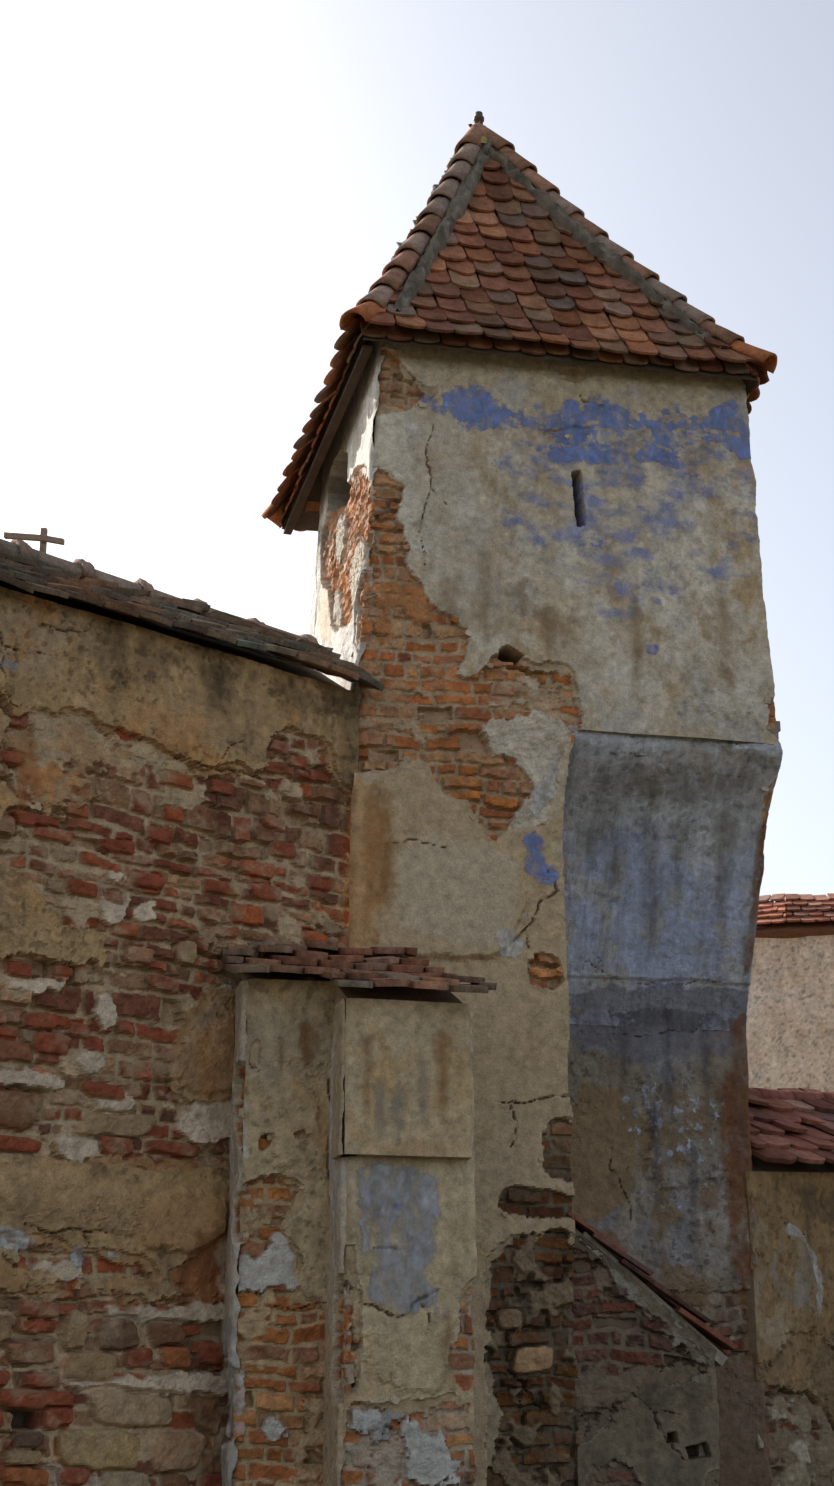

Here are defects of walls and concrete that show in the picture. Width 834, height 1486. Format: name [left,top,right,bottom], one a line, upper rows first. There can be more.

crack [419,421,451,566]
peeling [376,347,751,562]
crack [173,738,287,783]
flaking render [0,464,584,1173]
damp [622,1082,728,1185]
flaking render [0,1116,710,1486]
flaking render [756,1380,834,1486]